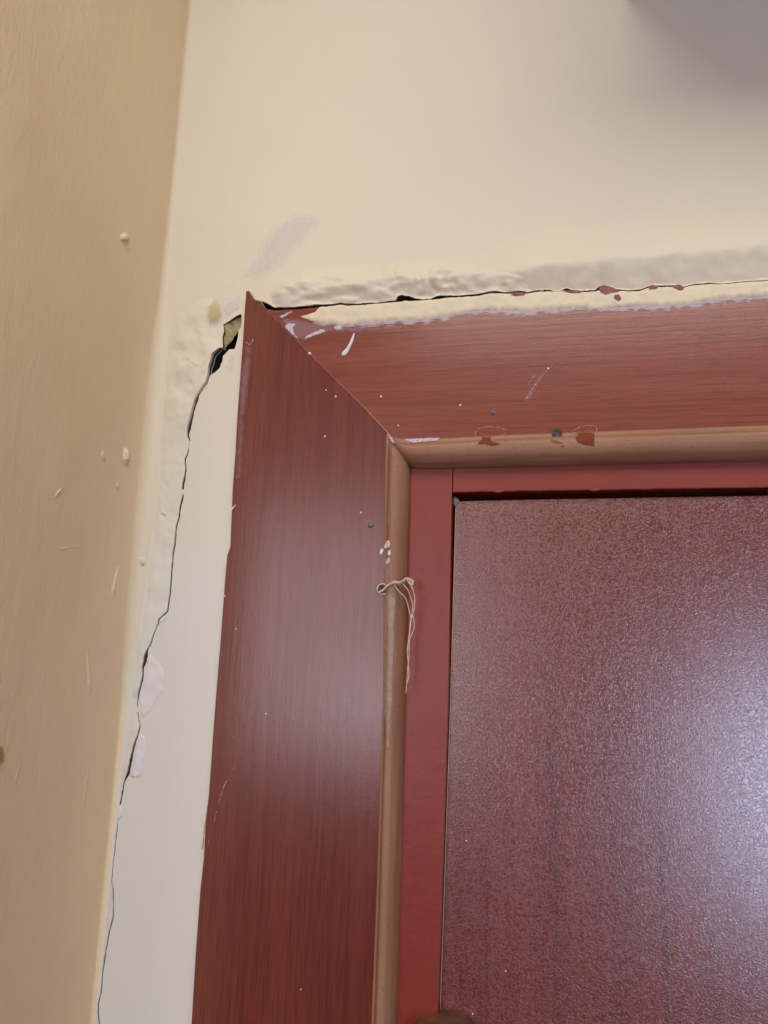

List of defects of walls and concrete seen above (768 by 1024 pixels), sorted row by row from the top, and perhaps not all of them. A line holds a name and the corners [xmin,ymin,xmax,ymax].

crack [262,280,768,311]
peeling [139,654,165,716]
crack [98,376,210,1024]
peeling [131,735,147,778]